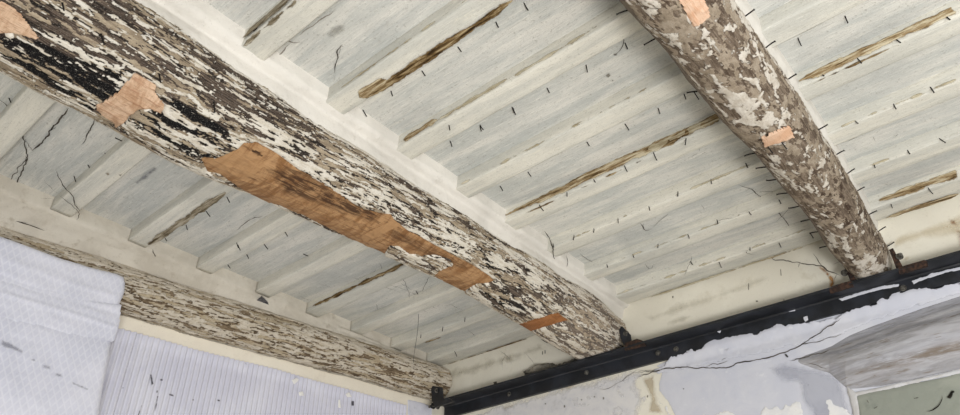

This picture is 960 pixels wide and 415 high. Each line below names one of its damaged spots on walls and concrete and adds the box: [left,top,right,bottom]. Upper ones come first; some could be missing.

crack [11,108,69,182]
crack [45,173,80,220]
crack [603,319,840,390]
peeling [657,267,960,415]